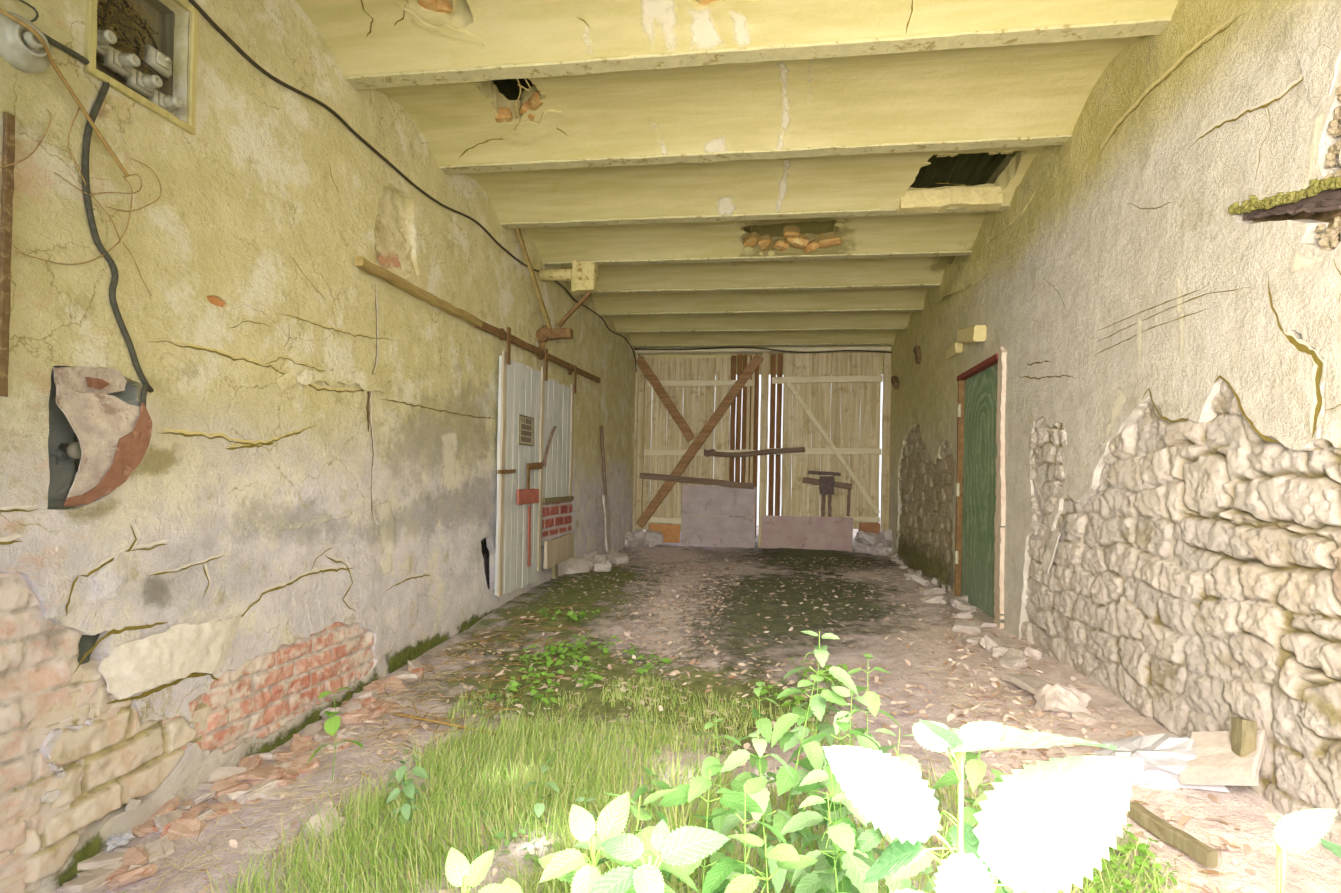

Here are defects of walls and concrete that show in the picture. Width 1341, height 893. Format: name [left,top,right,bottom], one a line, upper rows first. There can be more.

spalling [495,91,543,123]
crack [1186,43,1319,180]
spalling [738,219,846,256]
crack [152,254,494,531]
crack [1214,375,1279,442]
crack [1268,276,1341,438]
crack [75,622,168,672]
crack [106,671,221,704]
spalling [0,572,375,893]
crack [65,520,356,620]
spalling [896,418,955,591]
spalling [1021,381,1341,865]